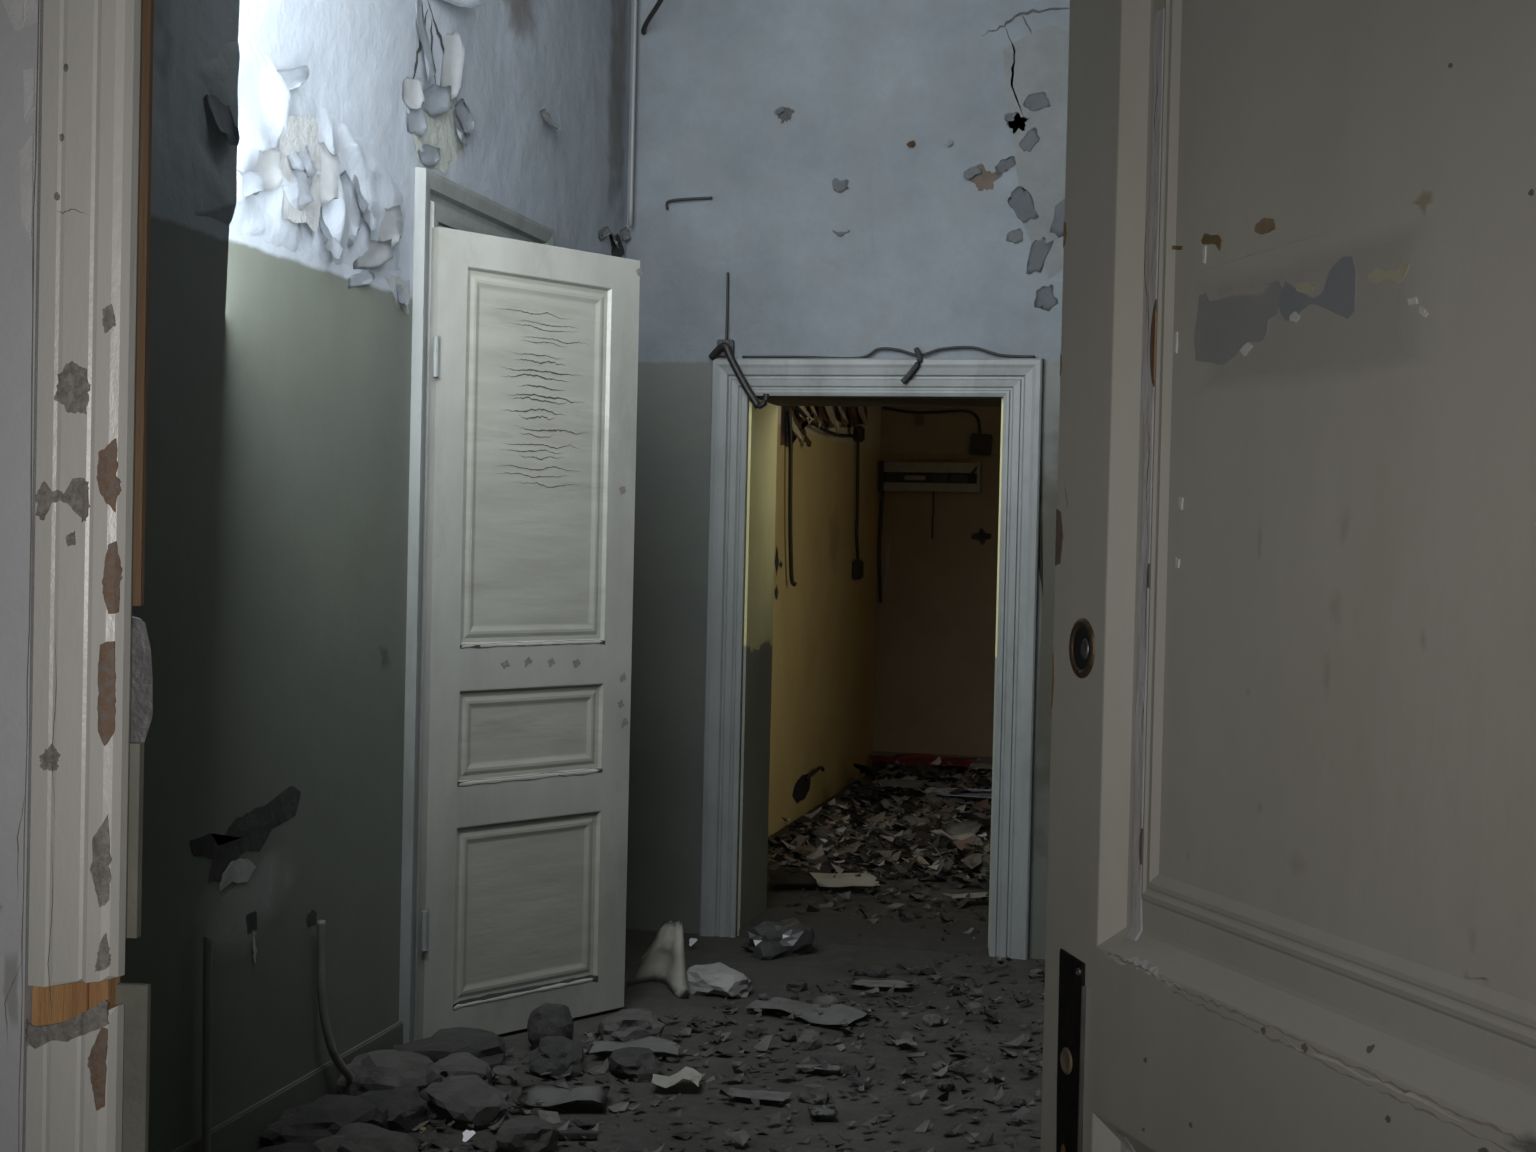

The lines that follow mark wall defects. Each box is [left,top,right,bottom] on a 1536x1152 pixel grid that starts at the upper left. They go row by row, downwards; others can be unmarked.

peeling [963,25,1069,311]
peeling [1194,256,1357,366]
peeling [54,361,91,414]
peeling [35,438,122,546]
peeling [102,541,123,614]
peeling [97,641,116,746]
peeling [90,815,112,907]
peeling [87,1028,108,1111]